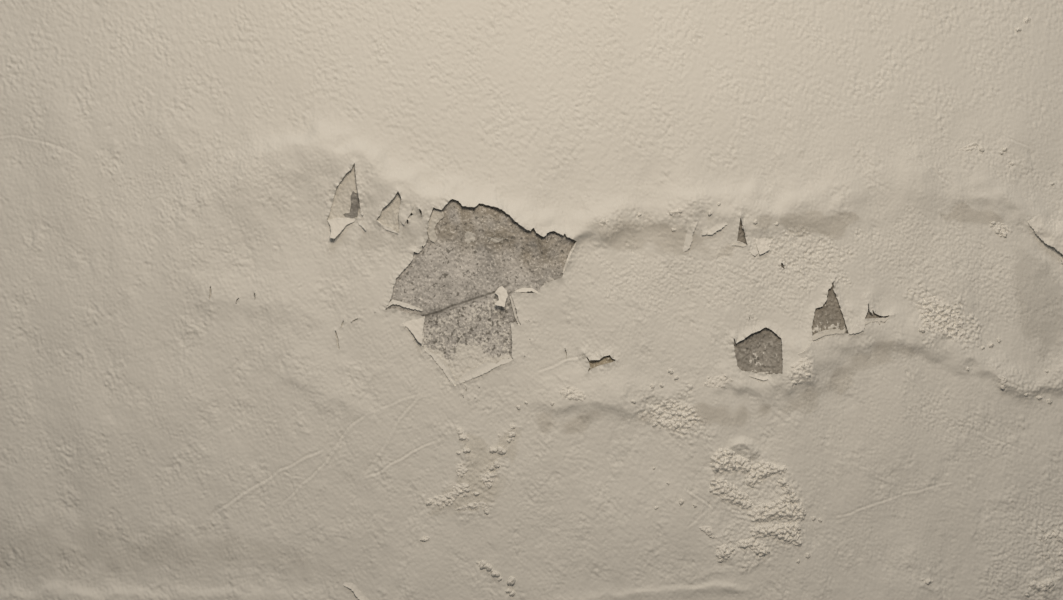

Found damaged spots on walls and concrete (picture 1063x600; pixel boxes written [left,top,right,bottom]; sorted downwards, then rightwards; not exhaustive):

peeling [321,157,585,394]
peeling [575,345,626,382]
spalling [649,369,701,432]
peeling [703,272,898,389]